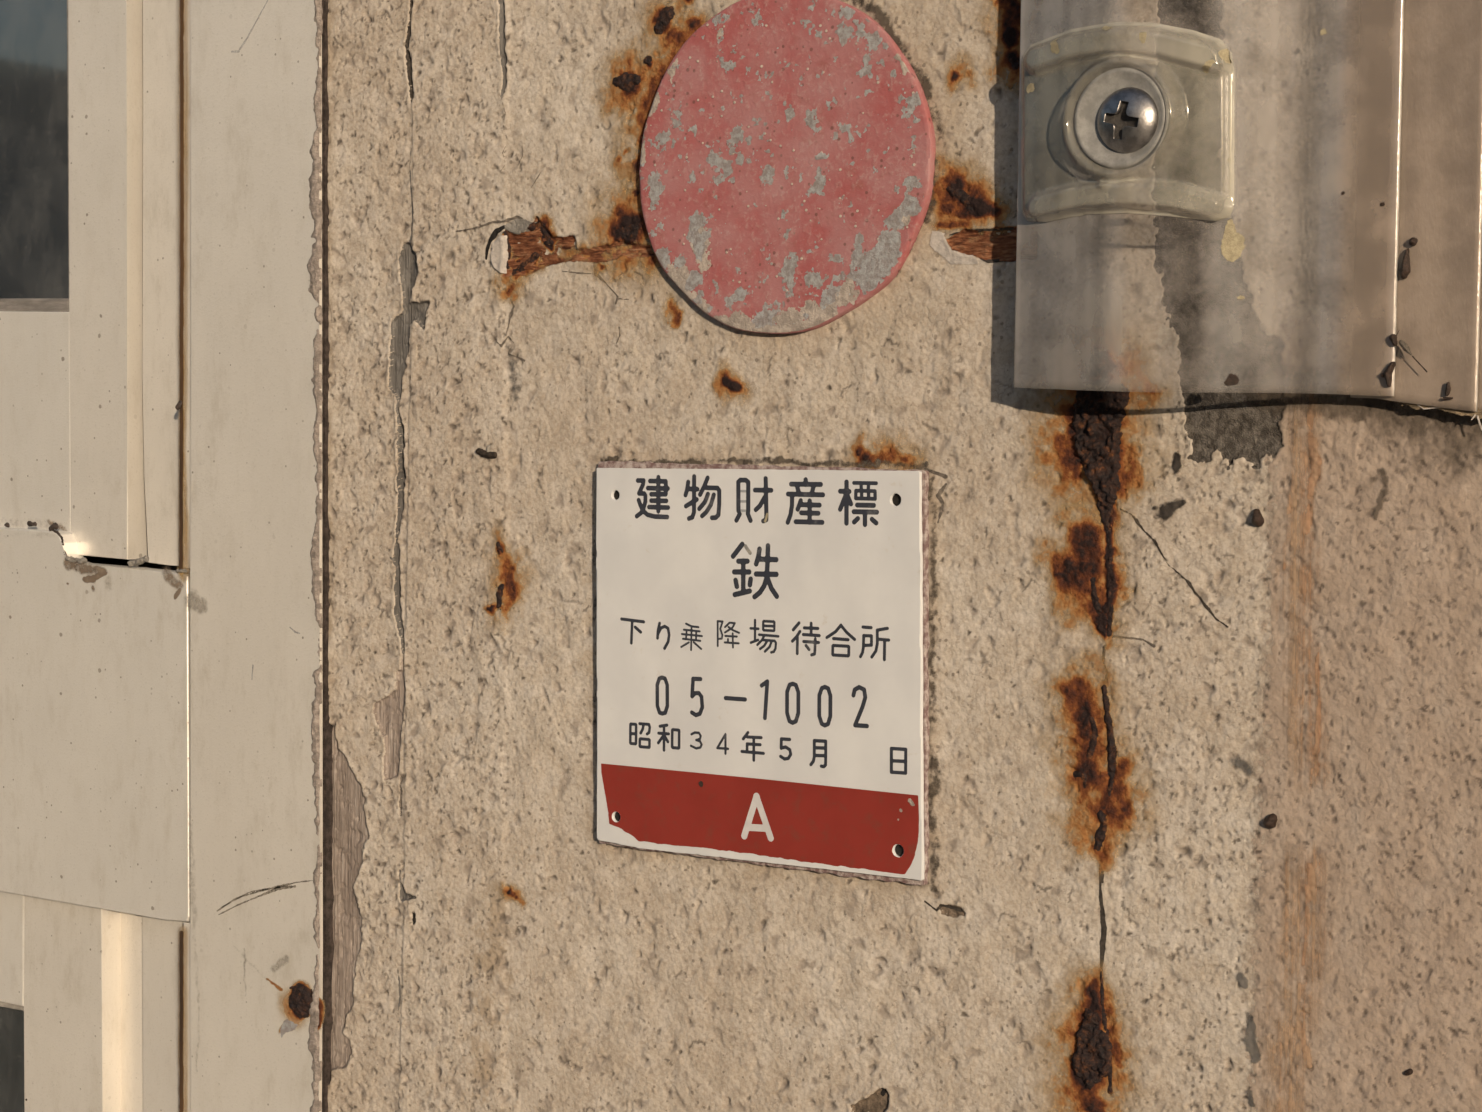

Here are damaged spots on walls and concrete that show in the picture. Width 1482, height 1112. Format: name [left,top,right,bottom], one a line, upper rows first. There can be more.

crack [405,0,414,102]
corrosion [946,0,1050,93]
corrosion [589,0,708,280]
corrosion [928,156,1011,231]
crack [373,148,430,816]
corrosion [483,529,525,621]
corrosion [1032,325,1164,873]
crack [1102,635,1156,678]
water stain [1232,314,1482,1112]
crack [399,870,416,925]
crack [1099,872,1107,969]
corrosion [1045,966,1135,1112]